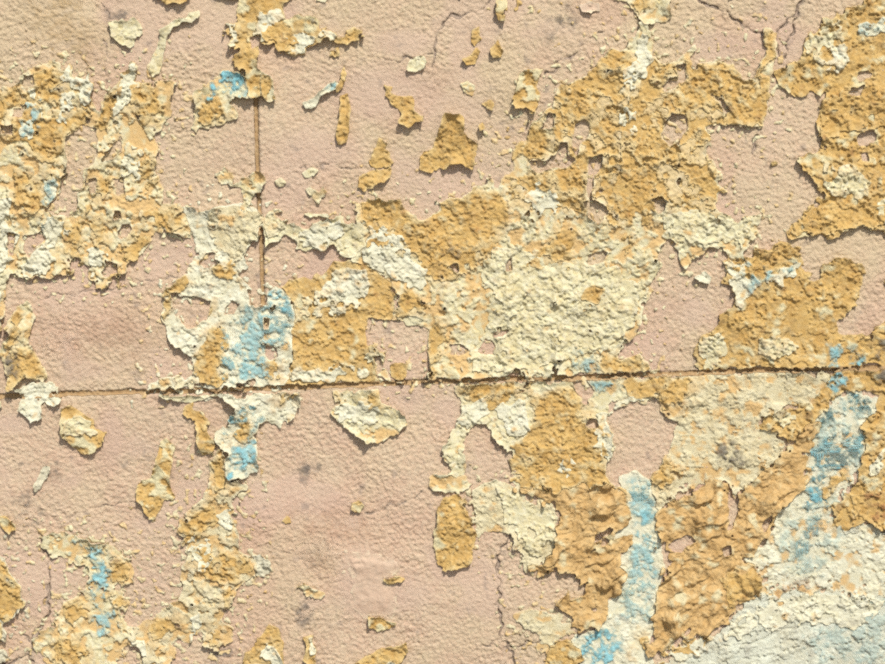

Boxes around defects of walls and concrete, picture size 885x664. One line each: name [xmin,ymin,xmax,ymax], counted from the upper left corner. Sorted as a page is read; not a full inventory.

peeling [108,17,143,57]
peeling [406,56,427,72]
peeling [462,26,504,65]
crack [698,0,802,59]
peeling [302,67,351,152]
peeling [384,85,424,128]
peeling [59,405,107,455]
peeling [33,466,50,493]
peeling [0,559,28,639]
crack [488,534,526,664]
peeling [237,624,284,664]